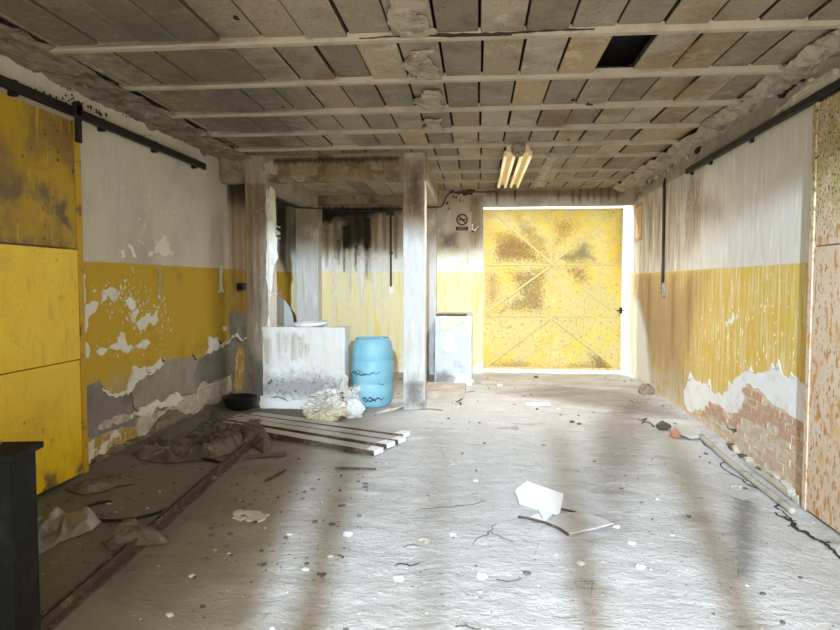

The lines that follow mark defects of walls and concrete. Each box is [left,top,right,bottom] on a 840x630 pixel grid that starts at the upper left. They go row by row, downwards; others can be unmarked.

spalling [0,20,48,44]
spalling [28,82,108,117]
spalling [770,67,840,119]
leakage [322,207,398,306]
peeling [84,267,172,359]
spalling [87,310,248,464]
peeling [684,359,805,505]
crack [473,524,514,545]
crack [702,441,840,559]